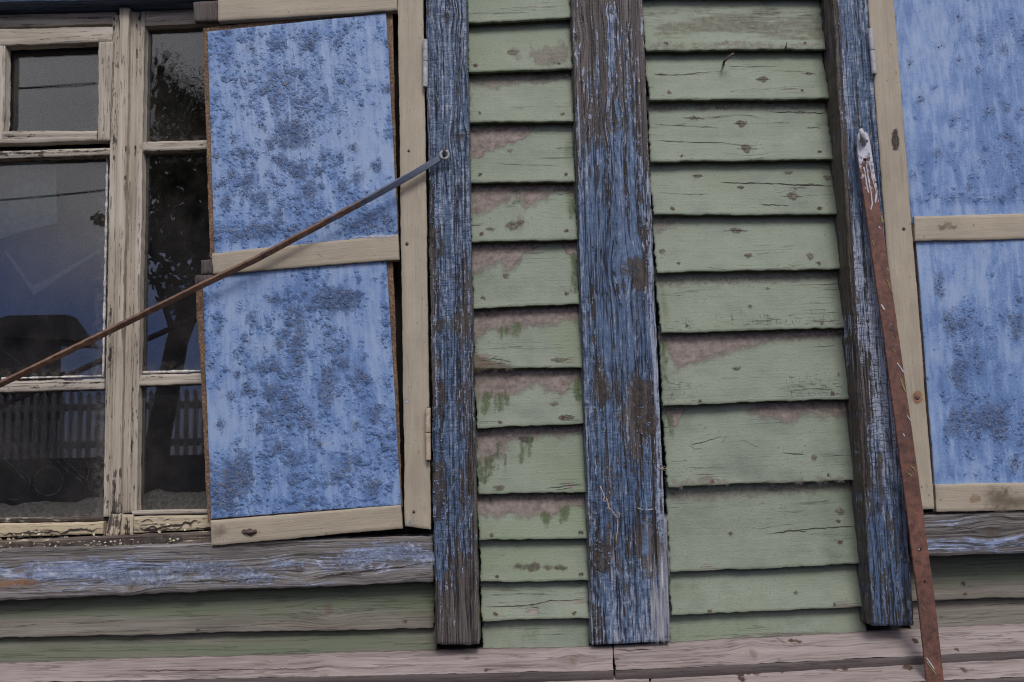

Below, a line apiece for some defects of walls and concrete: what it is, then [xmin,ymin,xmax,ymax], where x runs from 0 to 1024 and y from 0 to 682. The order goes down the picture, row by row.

peeling [470,126,533,160]
peeling [471,183,575,214]
peeling [472,241,579,337]
peeling [660,329,842,379]
peeling [465,355,581,411]
peeling [632,375,685,438]
peeling [751,400,847,422]
peeling [433,371,445,539]
peeling [459,424,585,524]
peeling [0,535,183,548]